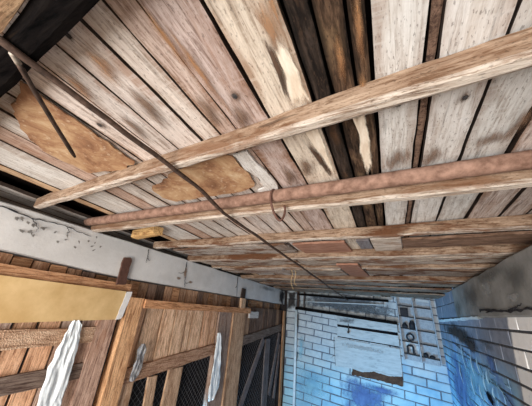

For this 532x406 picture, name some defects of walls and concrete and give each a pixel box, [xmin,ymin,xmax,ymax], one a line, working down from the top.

crack [0,206,89,236]
crack [479,303,532,313]